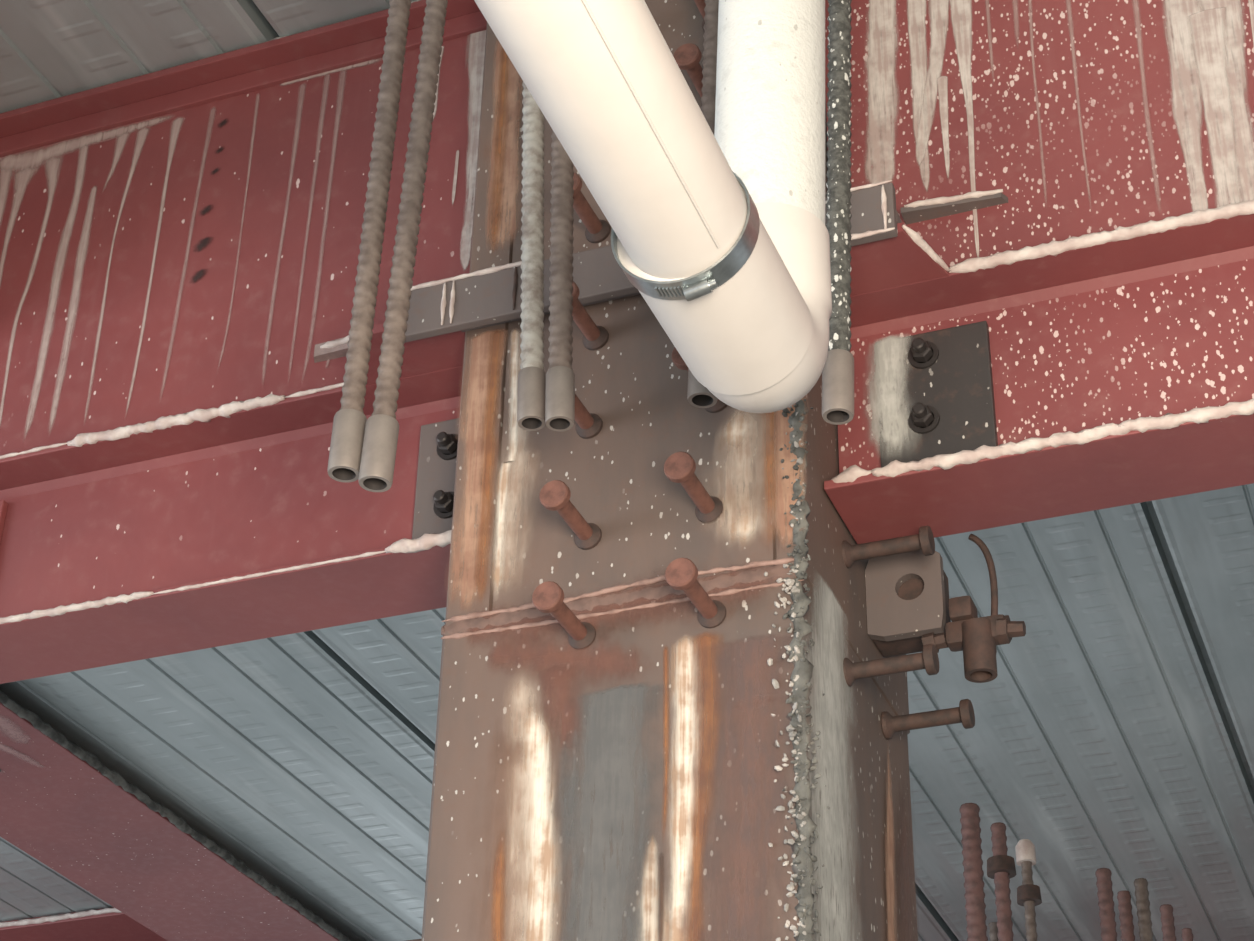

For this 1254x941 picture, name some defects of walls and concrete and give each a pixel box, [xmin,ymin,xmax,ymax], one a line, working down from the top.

leakage [0,117,182,432]
leakage [163,108,215,386]
leakage [264,60,377,364]
rust [487,40,522,245]
leakage [866,0,976,192]
leakage [1013,0,1046,195]
leakage [1067,0,1090,196]
leakage [1133,0,1159,200]
leakage [1165,0,1254,211]
rust [452,330,505,605]
leakage [506,682,555,941]
leakage [640,638,701,941]